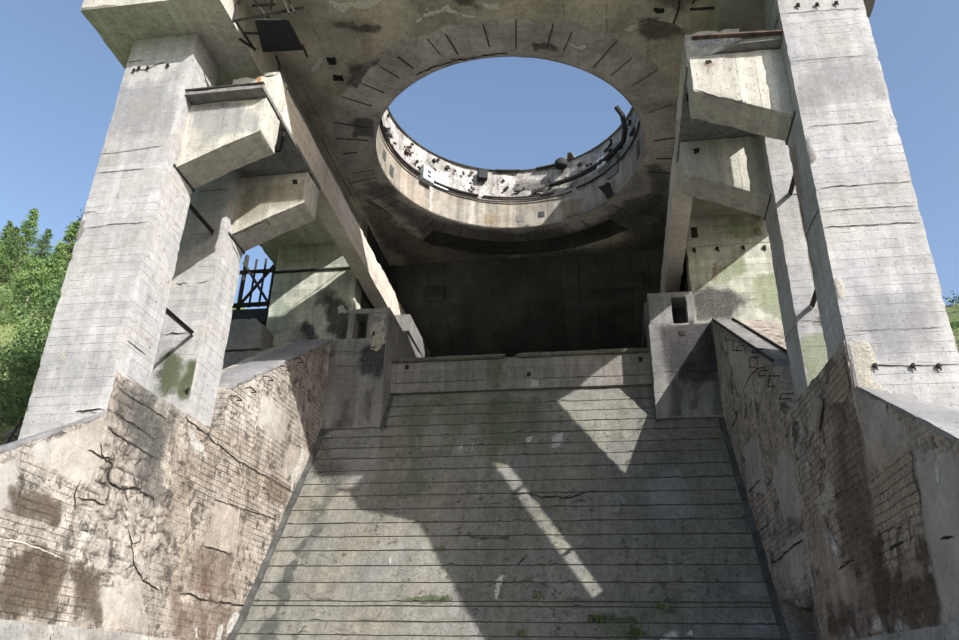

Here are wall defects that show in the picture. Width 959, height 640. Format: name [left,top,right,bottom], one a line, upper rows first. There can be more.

corrosion [691,29,783,40]
spalling [370,313,386,351]
damp [9,486,61,526]
crack [490,490,601,504]
crack [771,433,845,602]
damp [0,544,103,626]
damp [259,539,307,640]
spalling [778,589,820,640]
damp [871,535,940,634]